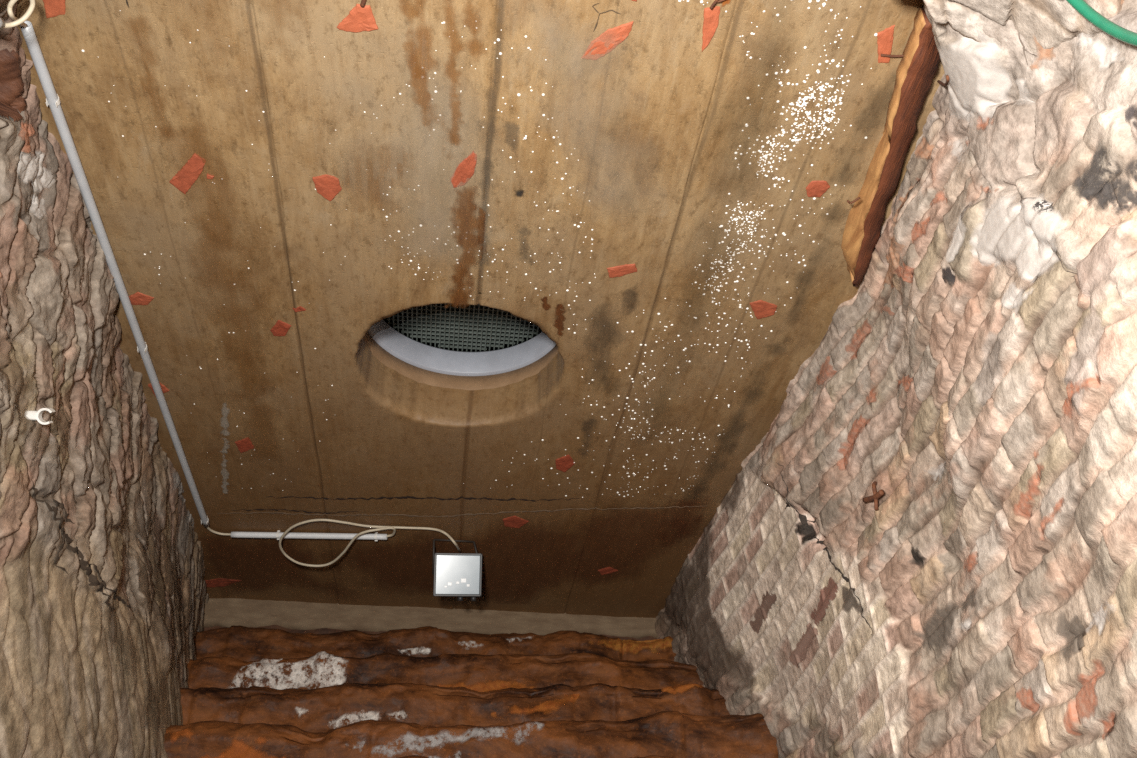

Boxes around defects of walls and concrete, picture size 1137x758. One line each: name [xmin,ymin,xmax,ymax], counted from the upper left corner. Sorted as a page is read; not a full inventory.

flaking render [337,4,378,33]
flaking render [581,21,634,60]
flaking render [702,6,720,51]
flaking render [169,153,214,194]
flaking render [313,174,342,201]
flaking render [450,151,477,188]
rust [452,192,486,305]
crack [32,481,131,618]
crack [777,463,873,635]